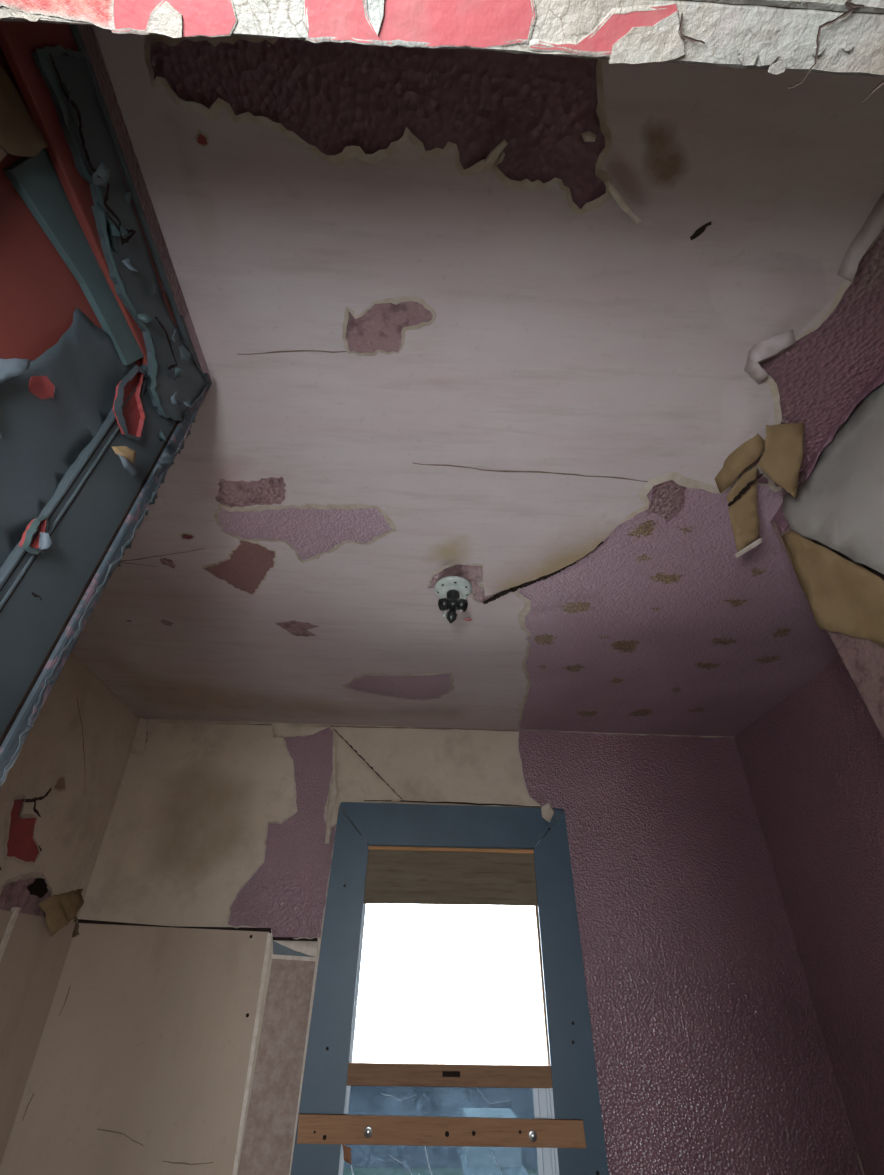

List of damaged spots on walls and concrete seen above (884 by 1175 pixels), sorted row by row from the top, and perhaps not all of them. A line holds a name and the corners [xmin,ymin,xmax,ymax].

crack [678,13,705,44]
crack [789,0,865,89]
peeling [0,0,684,216]
damp [634,108,697,196]
peeling [31,45,208,516]
peeling [342,296,437,356]
peeling [758,227,884,484]
crack [413,463,648,482]
peeling [201,476,396,595]
crack [482,541,604,605]
peeling [0,795,53,917]
crack [97,1128,213,1165]